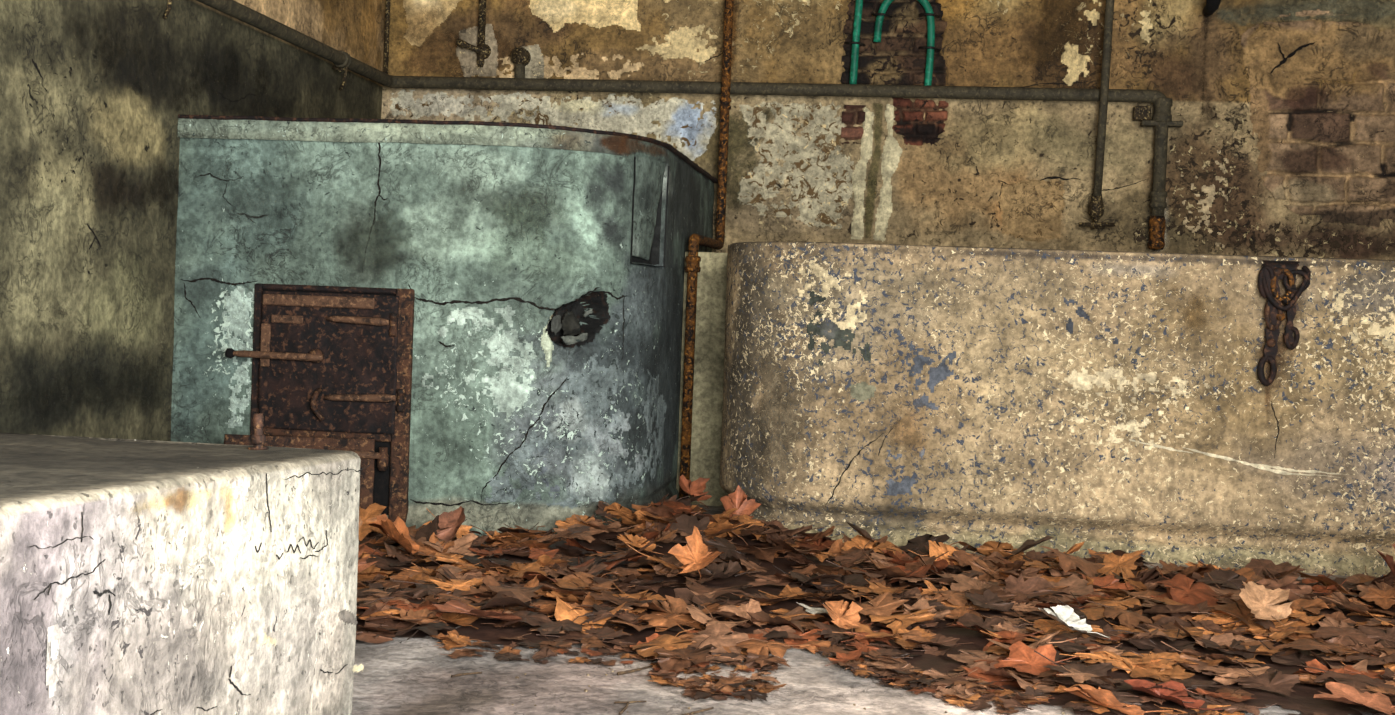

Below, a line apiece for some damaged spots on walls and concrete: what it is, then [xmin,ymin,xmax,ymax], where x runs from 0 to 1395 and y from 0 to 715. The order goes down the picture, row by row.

peeling [390,0,718,161]
flaking render [840,0,949,146]
peeling [738,101,866,229]
peeling [416,356,448,389]
crack [410,378,567,506]
crack [408,284,627,359]
peeling [437,291,667,509]
peeling [1322,283,1395,352]